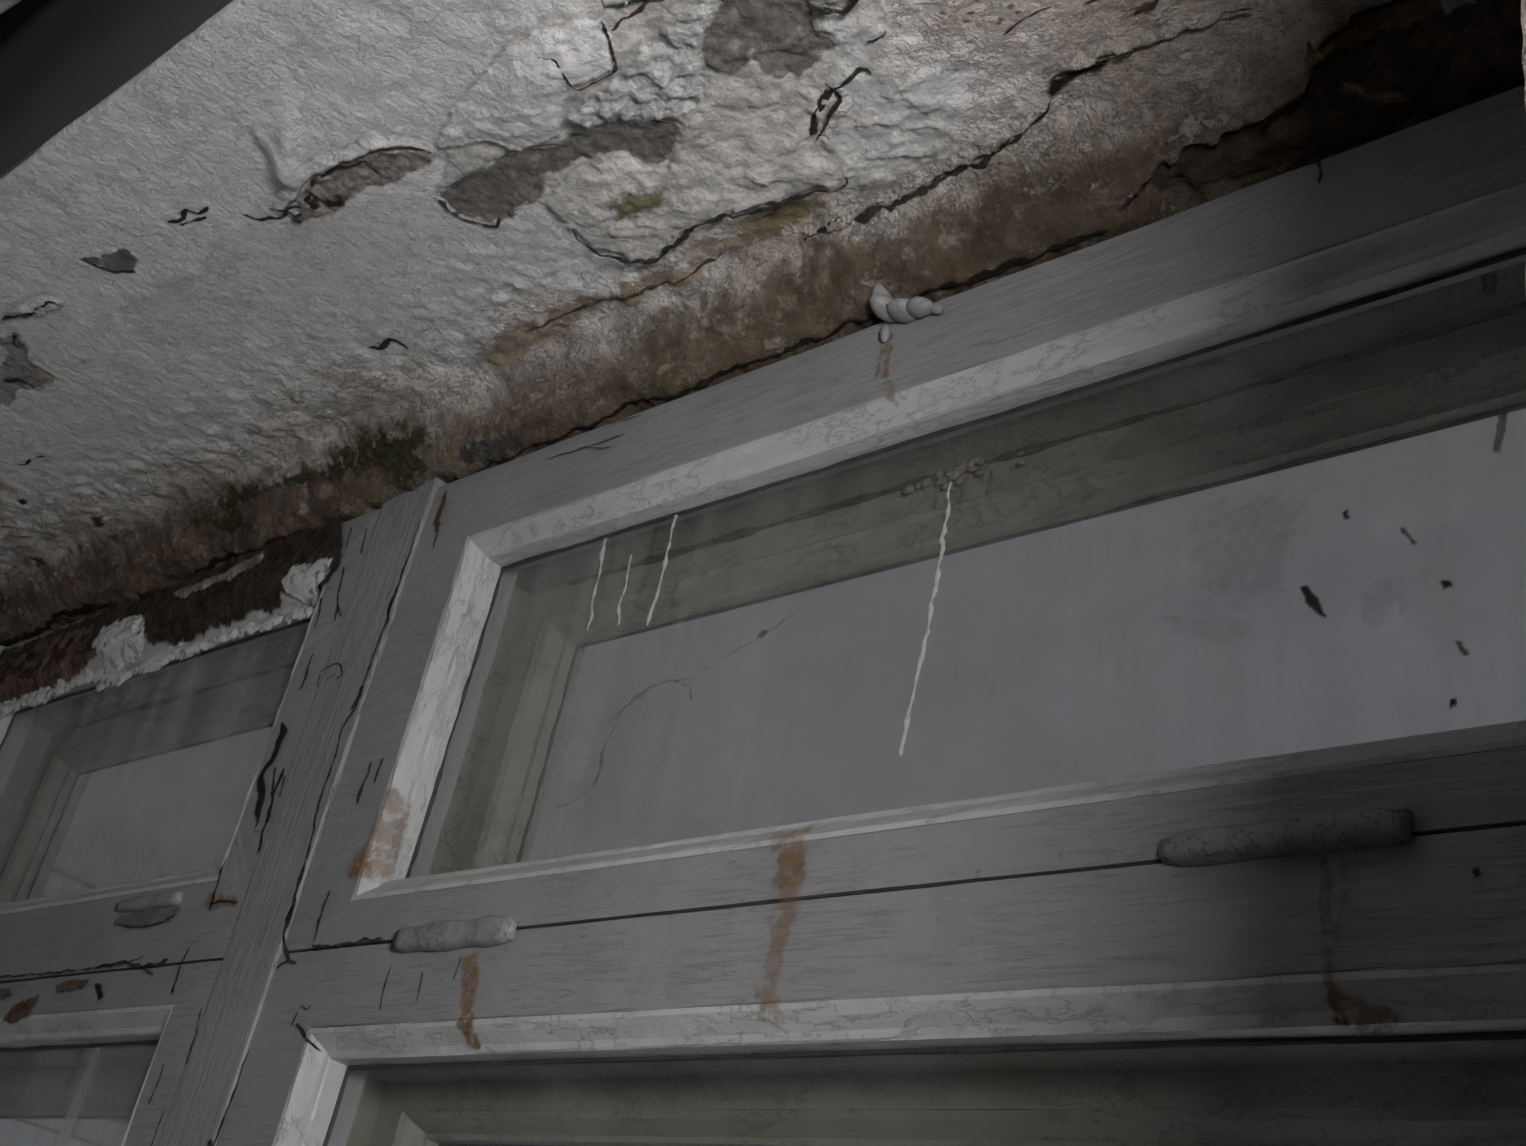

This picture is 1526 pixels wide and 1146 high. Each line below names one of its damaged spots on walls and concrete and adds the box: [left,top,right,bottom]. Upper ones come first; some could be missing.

flaking render [269,0,872,265]
water stain [814,4,958,190]
crack [800,0,1252,241]
peeling [79,248,138,274]
water stain [124,197,574,347]
crack [917,230,1107,297]
mould [194,420,430,532]
peeling [0,515,343,720]
crack [277,314,877,1009]
crack [254,722,288,855]
peeling [0,956,143,1024]
corrosion [457,953,480,1049]